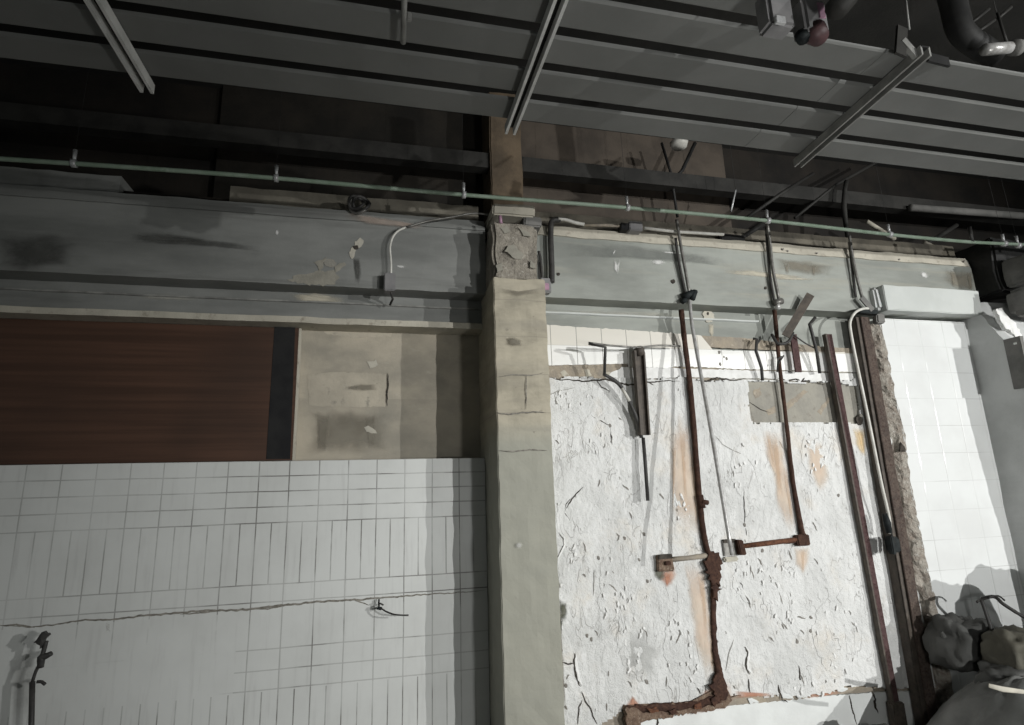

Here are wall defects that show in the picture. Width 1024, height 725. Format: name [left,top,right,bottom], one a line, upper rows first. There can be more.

water stain [10,240,62,266]
water stain [145,235,234,248]
crack [499,373,767,415]
flaking render [749,384,855,480]
corrosion [675,437,696,513]
corrosion [768,445,791,511]
spalling [870,324,938,631]
flaking render [555,501,600,594]
crack [0,590,481,628]
corrosion [691,578,712,658]
crack [563,654,597,723]
flaking render [728,675,875,706]